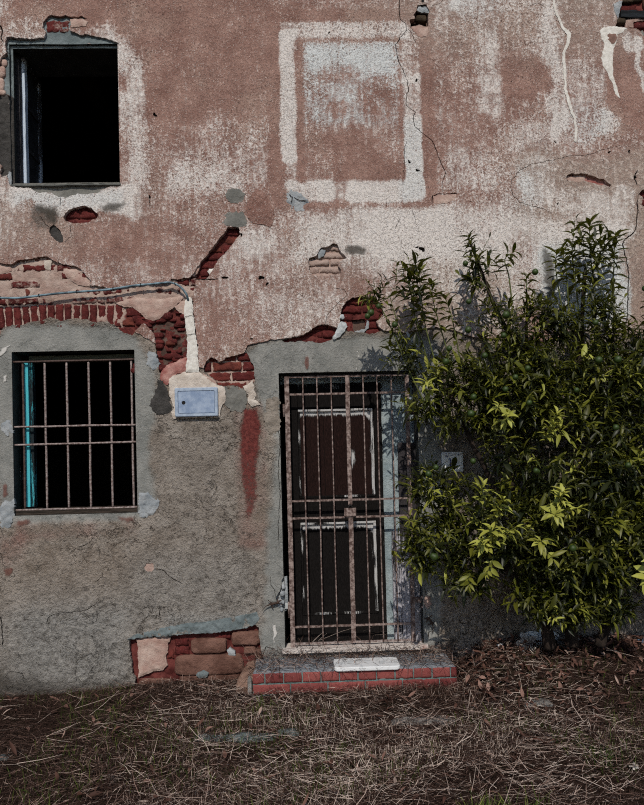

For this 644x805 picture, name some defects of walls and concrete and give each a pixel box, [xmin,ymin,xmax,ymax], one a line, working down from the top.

flaking render [600,0,644,98]
flaking render [0,17,120,198]
crack [510,0,590,198]
flaking render [566,175,610,187]
flaking render [50,225,63,243]
flaking render [65,208,98,223]
flaking render [308,245,346,277]
flaking render [0,229,242,385]
flaking render [203,353,260,407]
flaking render [130,625,265,684]